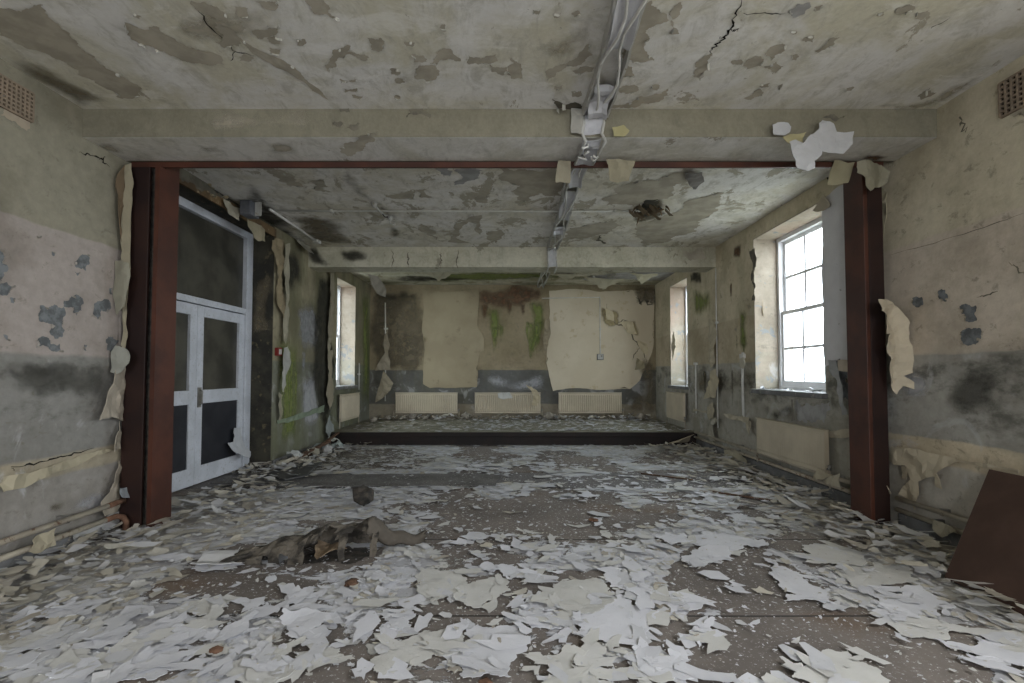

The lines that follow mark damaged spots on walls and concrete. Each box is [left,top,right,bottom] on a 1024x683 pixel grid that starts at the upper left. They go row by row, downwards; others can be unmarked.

peeling [0,4,142,99]
peeling [124,13,224,66]
peeling [230,23,328,100]
peeling [390,42,522,100]
peeling [612,1,682,109]
crack [710,0,785,53]
peeling [602,171,724,244]
peeling [36,288,113,352]
damp [254,255,299,331]
damp [280,279,335,422]
peeling [422,290,484,388]
peeling [546,272,675,391]